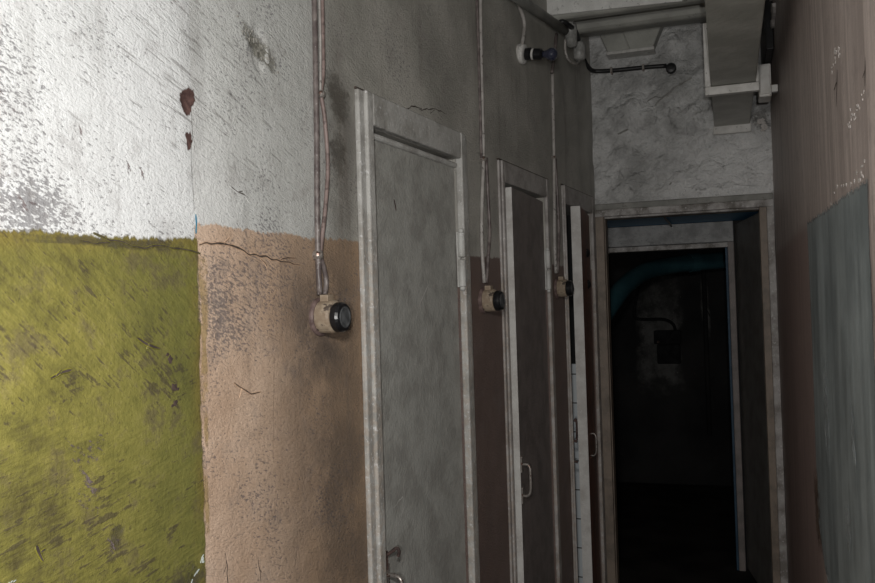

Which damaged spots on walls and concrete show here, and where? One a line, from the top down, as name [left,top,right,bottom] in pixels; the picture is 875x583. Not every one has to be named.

rust [180,87,195,116]
crack [407,105,446,115]
crack [199,237,301,268]